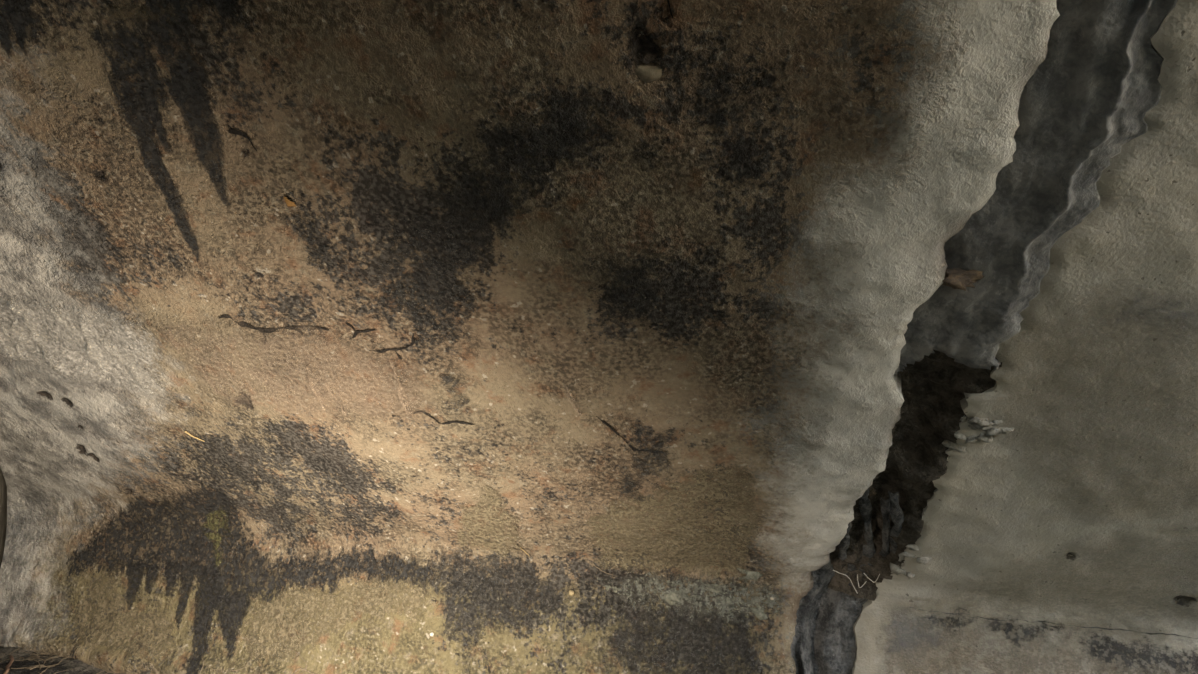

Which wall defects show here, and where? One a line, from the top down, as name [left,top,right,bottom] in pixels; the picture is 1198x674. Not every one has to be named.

leakage [0,0,63,58]
leakage [90,0,254,262]
leakage [373,89,666,424]
leakage [617,424,685,501]
leakage [66,484,574,674]
leakage [593,568,783,674]
crack [909,607,1198,639]